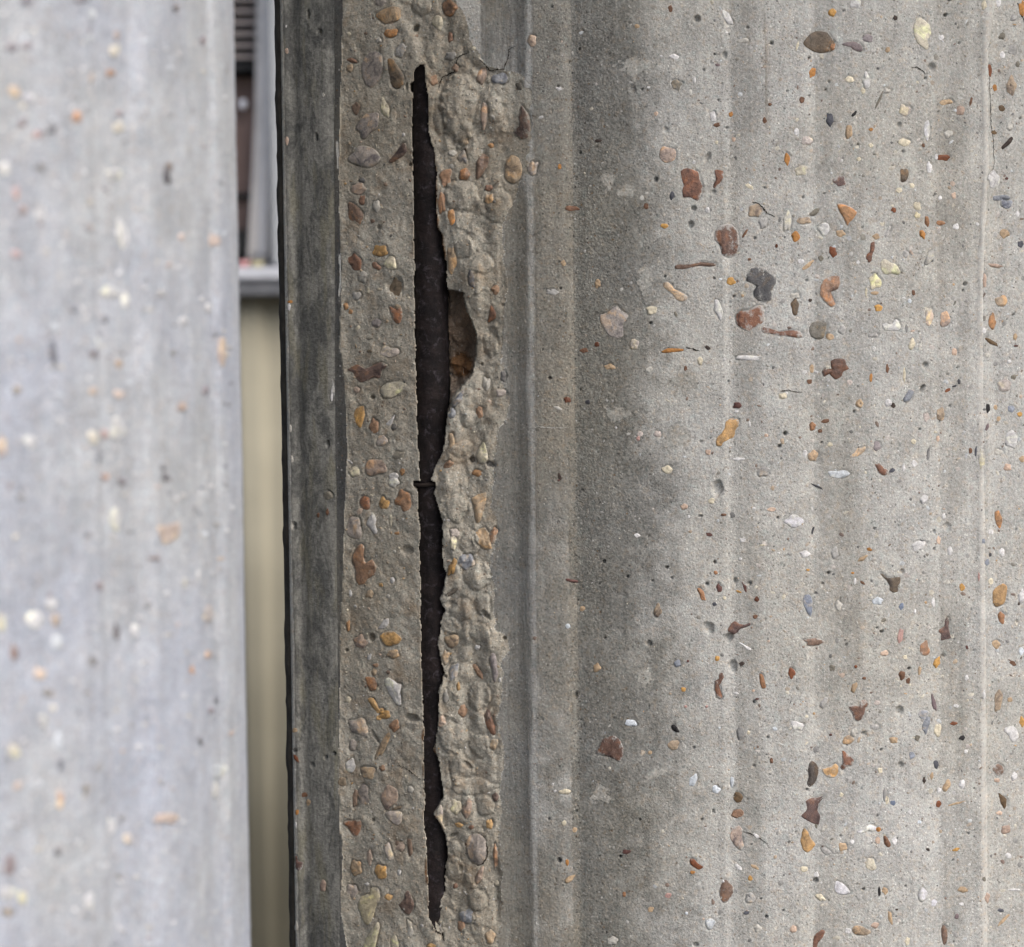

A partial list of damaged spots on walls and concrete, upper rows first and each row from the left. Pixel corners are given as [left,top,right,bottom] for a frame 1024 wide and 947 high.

spalling [332,0,538,947]
crack [439,46,515,87]